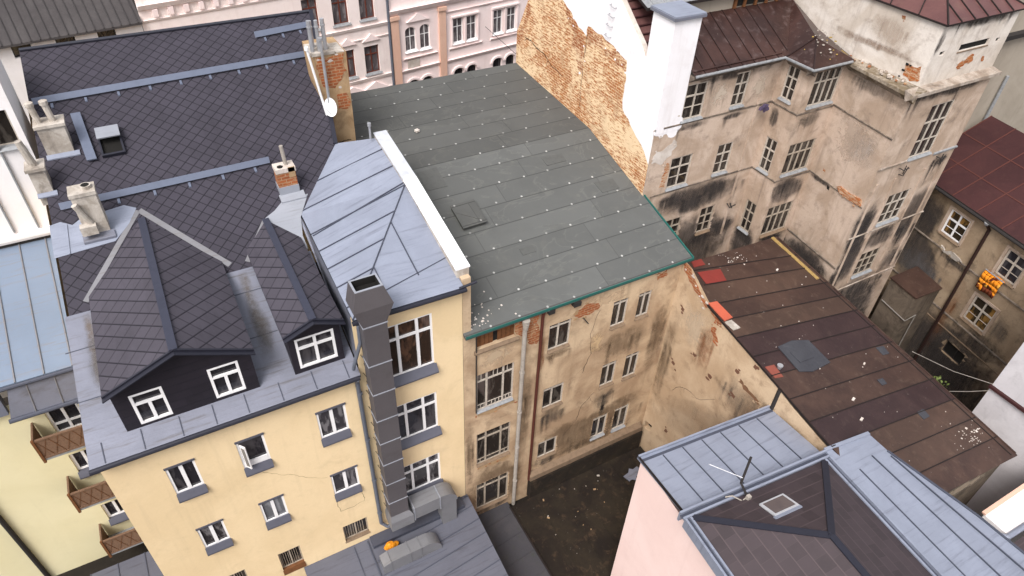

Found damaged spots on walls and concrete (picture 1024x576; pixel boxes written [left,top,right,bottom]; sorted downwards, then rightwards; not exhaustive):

spalling [516,2,531,58]
spalling [564,4,627,74]
flaking render [898,62,922,82]
spalling [956,54,984,69]
peeling [651,115,683,188]
flaking render [827,185,862,207]
flaking render [515,315,540,345]
spalling [573,302,600,321]
flaking render [684,263,723,346]
spalling [728,365,761,409]